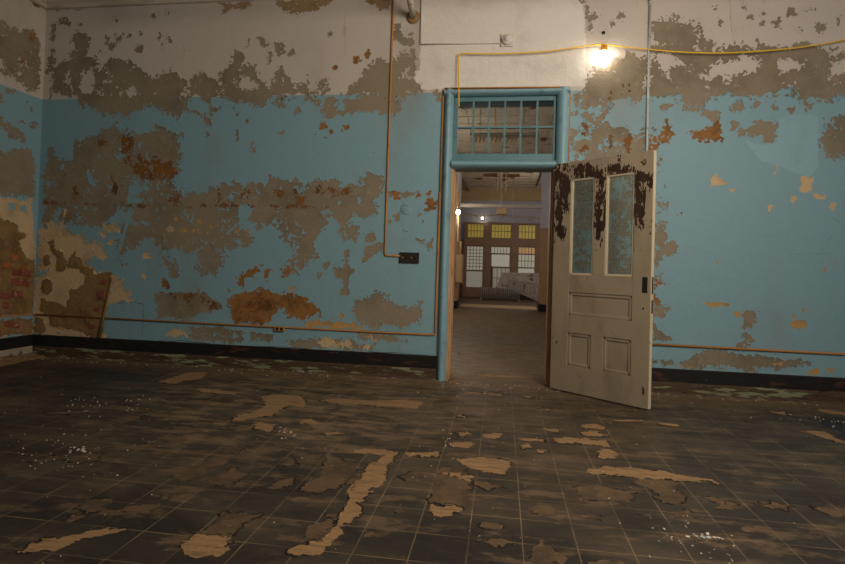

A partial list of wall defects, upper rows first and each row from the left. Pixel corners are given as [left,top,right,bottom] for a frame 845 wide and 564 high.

peeling [0,17,442,352]
peeling [652,301,836,376]